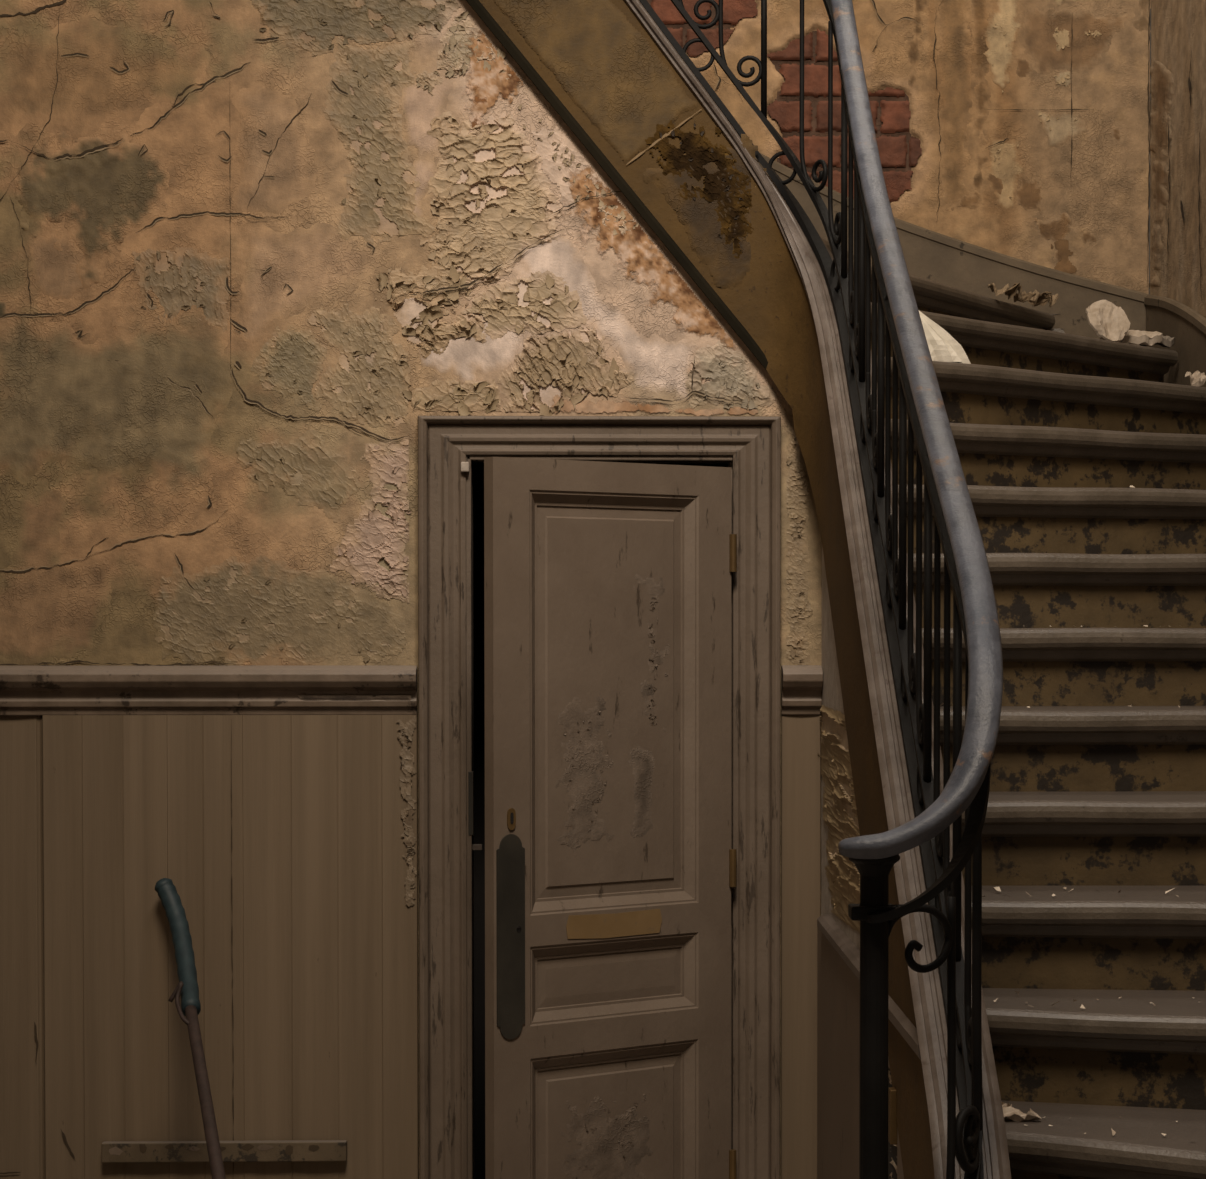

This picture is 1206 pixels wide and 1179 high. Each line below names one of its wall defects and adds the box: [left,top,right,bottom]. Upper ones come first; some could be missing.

crack [0,0,279,339]
crack [135,81,414,442]
peeling [131,0,777,665]
leakage [645,116,754,260]
flaking render [767,29,854,199]
flaking render [868,87,922,202]
leakage [905,0,1097,273]
leakage [1016,7,1135,78]
crack [0,495,228,591]
crack [0,659,244,667]
peeling [396,716,417,907]